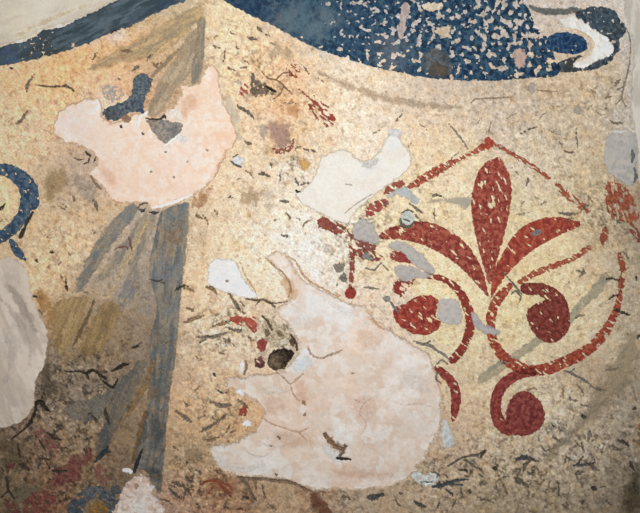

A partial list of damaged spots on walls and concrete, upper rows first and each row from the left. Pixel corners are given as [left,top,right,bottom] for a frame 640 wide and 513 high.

flaking render [53,64,273,210]
flaking render [285,115,412,264]
crack [64,363,129,389]
flaking render [196,250,454,501]
crack [11,396,67,473]
crack [1,477,15,499]
flaking render [112,468,193,513]